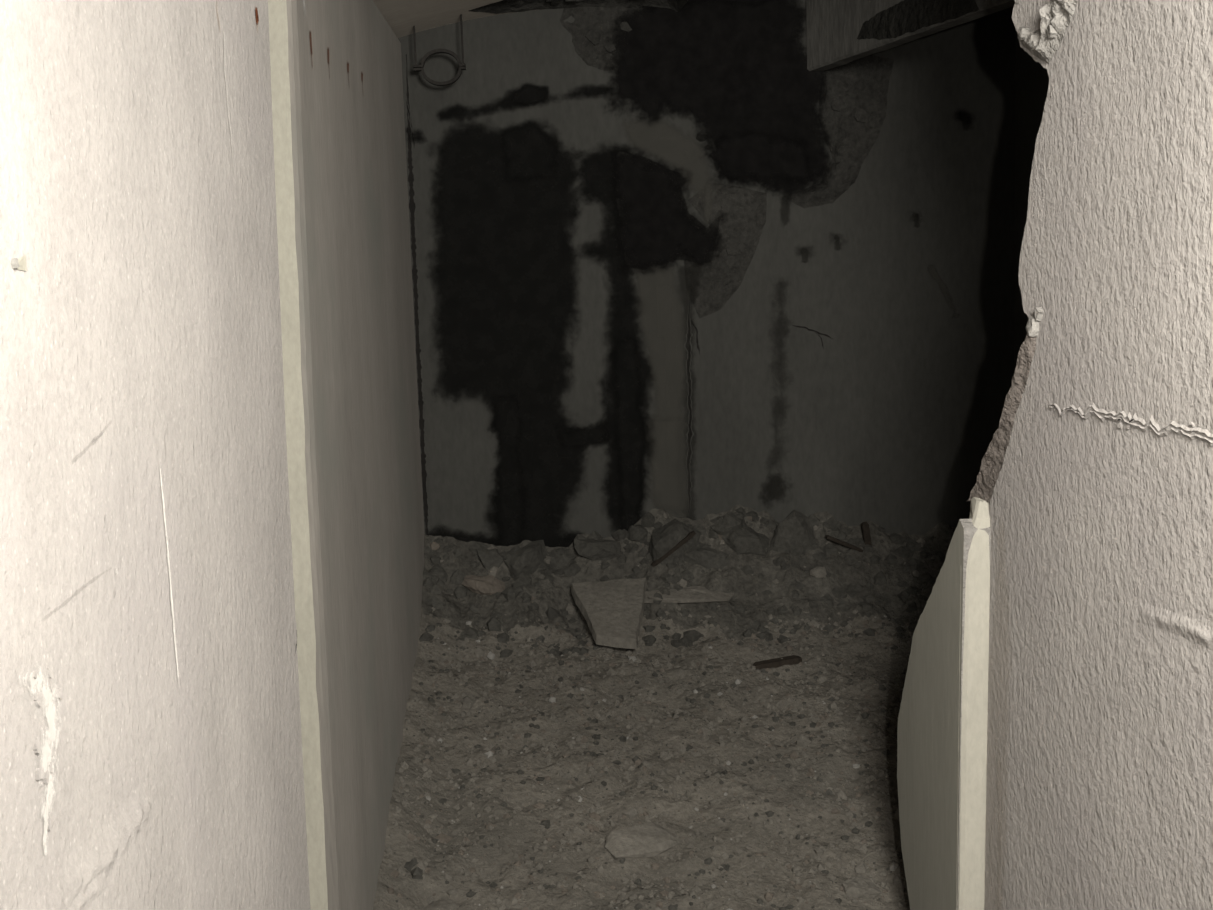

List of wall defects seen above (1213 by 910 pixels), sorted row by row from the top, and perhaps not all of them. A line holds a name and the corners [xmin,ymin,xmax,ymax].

spalling [470,0,688,71]
spalling [857,0,979,40]
spalling [1018,0,1078,63]
spalling [784,54,894,208]
leakage [428,85,813,547]
spalling [684,183,767,318]
spalling [967,307,1044,502]
leakage [25,668,63,853]